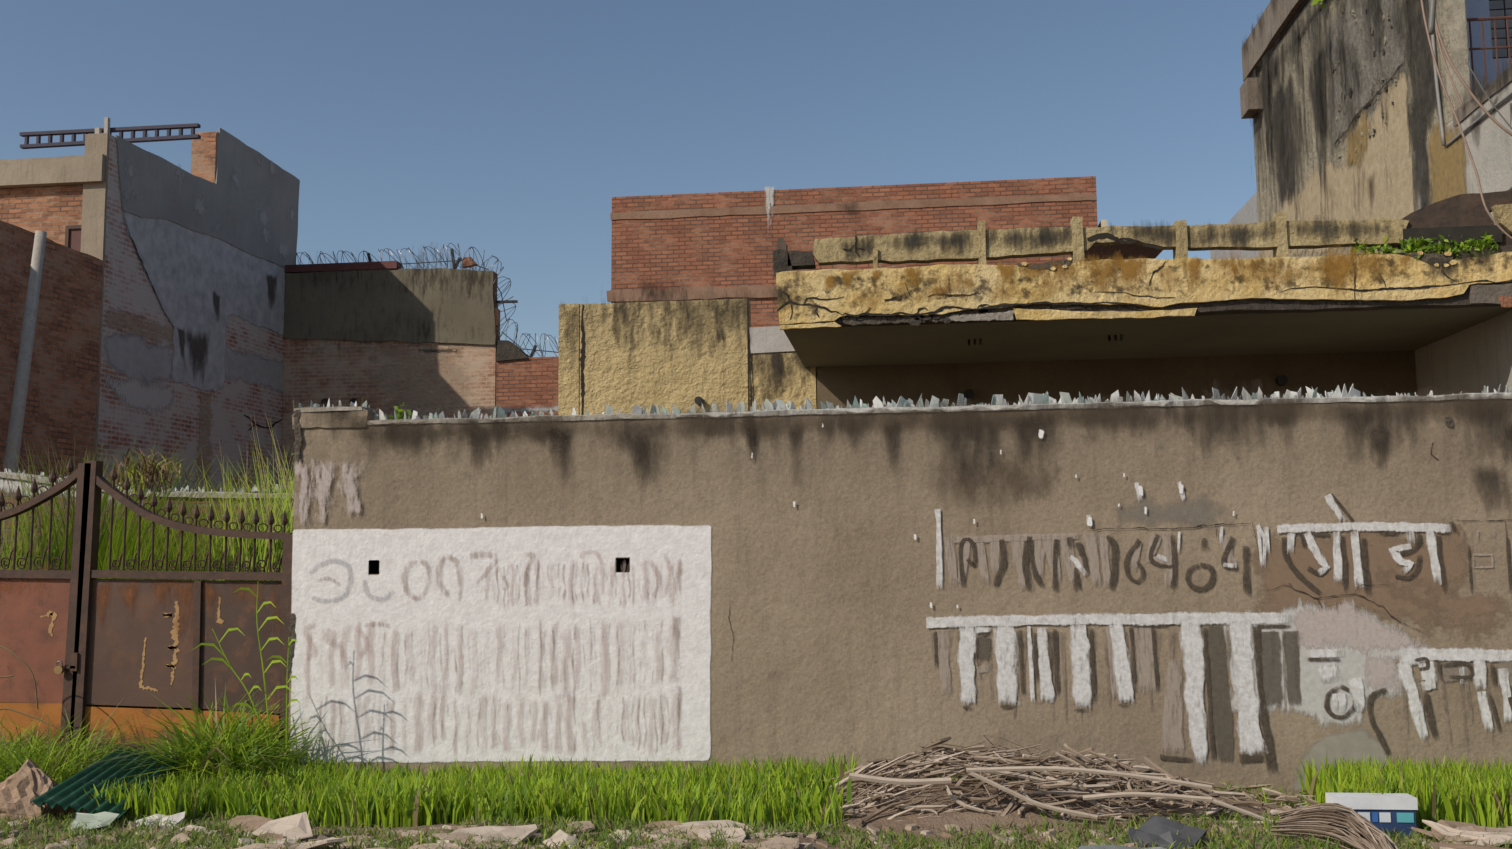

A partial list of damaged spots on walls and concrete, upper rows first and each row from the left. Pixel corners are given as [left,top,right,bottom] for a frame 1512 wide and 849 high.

water stain [1253,0,1440,209]
water stain [1134,225,1176,245]
water stain [1297,219,1379,238]
water stain [1199,227,1512,289]
water stain [178,329,207,373]
peeling [123,211,286,392]
crack [579,305,587,415]
crack [747,233,1176,407]
water stain [777,266,1177,315]
water stain [1185,392,1300,435]
water stain [885,406,1063,488]
flaking render [103,465,227,492]